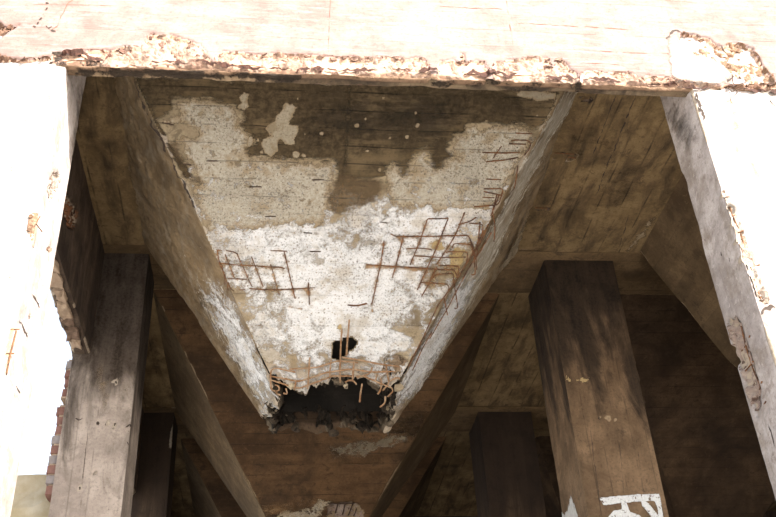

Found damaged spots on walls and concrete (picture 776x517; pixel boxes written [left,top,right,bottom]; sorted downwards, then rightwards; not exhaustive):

spalling [0,23,17,36]
water stain [135,77,558,417]
flaking render [0,31,776,416]
corrosion [366,223,474,288]